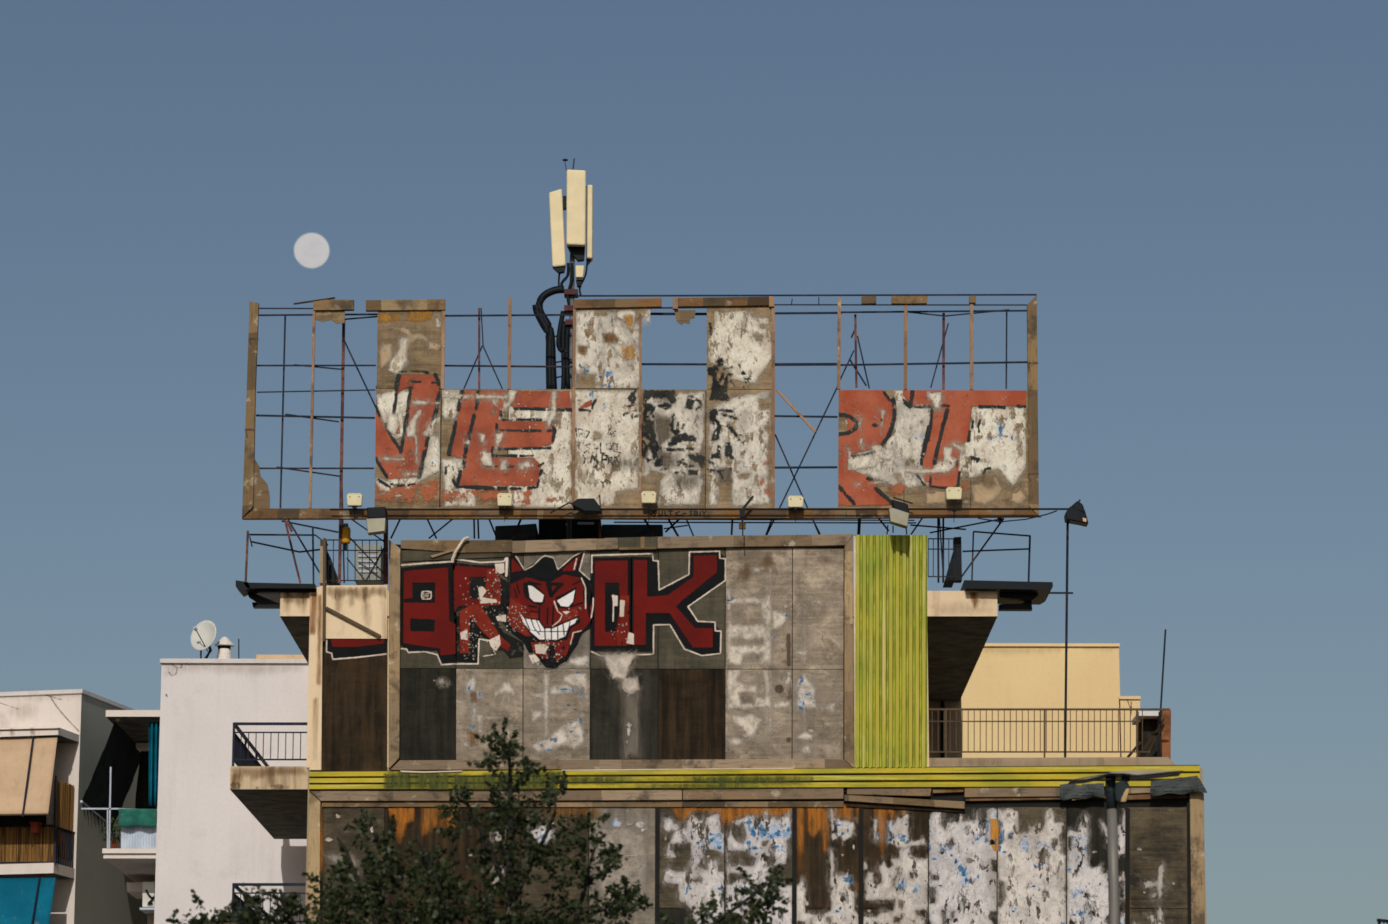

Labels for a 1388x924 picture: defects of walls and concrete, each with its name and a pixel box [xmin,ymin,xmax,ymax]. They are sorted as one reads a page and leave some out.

peeling [615,309,650,328]
peeling [916,391,958,411]
peeling [381,390,568,503]
peeling [846,405,969,505]
rust [389,807,455,837]
peeling [746,810,790,855]
rust [675,805,906,852]
peeling [875,823,979,882]
peeling [976,811,1053,853]